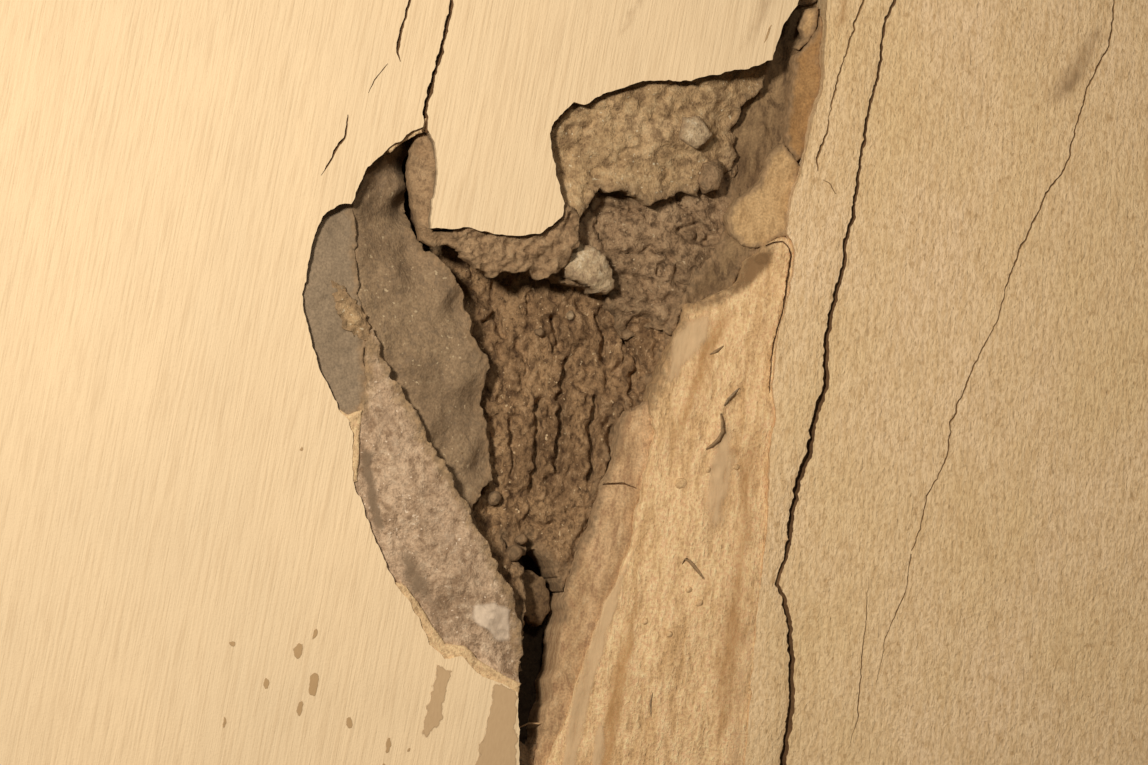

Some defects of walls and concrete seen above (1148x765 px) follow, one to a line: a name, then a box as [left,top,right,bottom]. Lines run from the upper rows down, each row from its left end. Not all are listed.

crack [368,0,411,93]
crack [421,0,454,132]
crack [321,115,348,175]
spalling [302,0,823,765]
crack [765,241,793,393]
crack [774,0,896,765]
crack [851,0,1115,739]
peeling [294,629,318,659]
peeling [297,673,319,716]